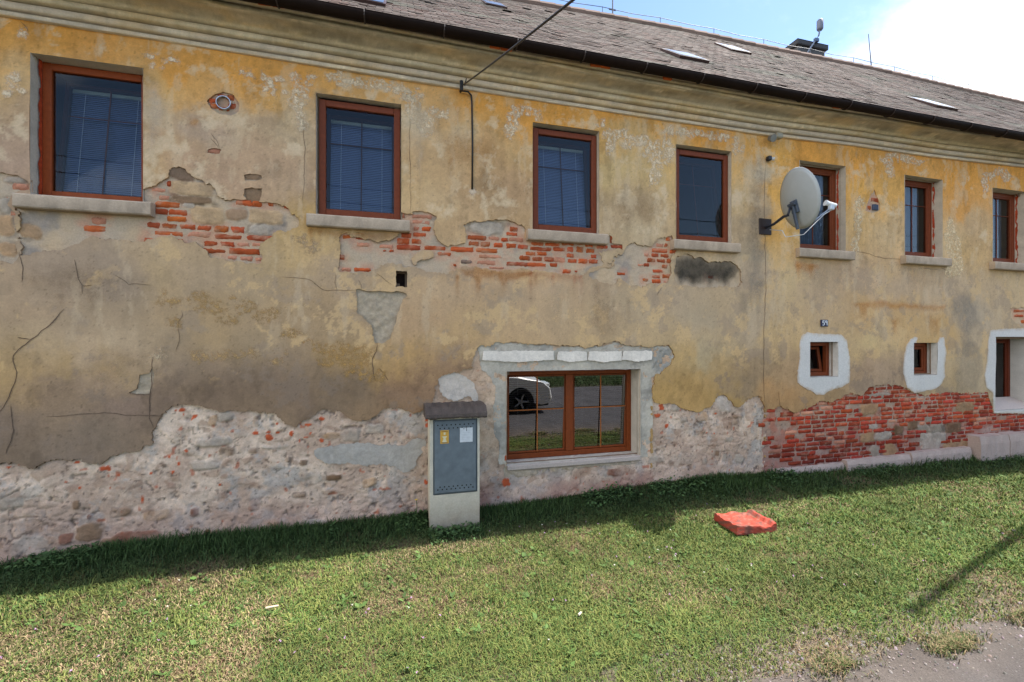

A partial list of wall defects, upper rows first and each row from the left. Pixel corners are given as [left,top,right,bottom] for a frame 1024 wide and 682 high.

crack [0,263,90,452]
crack [47,358,163,426]
flaking render [8,167,320,264]
flaking render [356,289,407,344]
flaking render [338,211,741,288]
leakage [678,259,735,280]
flaking render [433,341,1024,507]
flaking render [0,404,428,565]